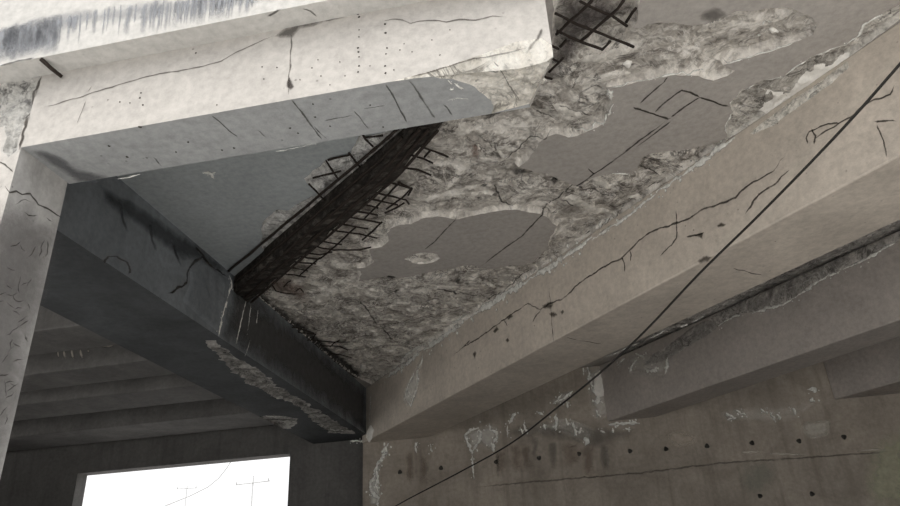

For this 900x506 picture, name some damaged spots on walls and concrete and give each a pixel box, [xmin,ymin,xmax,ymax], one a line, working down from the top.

damp [0,0,253,52]
rust [544,0,637,80]
crack [0,38,267,221]
crack [806,89,894,151]
spalling [259,0,900,385]
crack [487,78,727,262]
crack [456,165,788,353]
spalling [205,340,355,434]
damp [366,442,392,506]
damp [464,412,528,478]
damp [535,391,590,445]
damp [582,367,604,417]